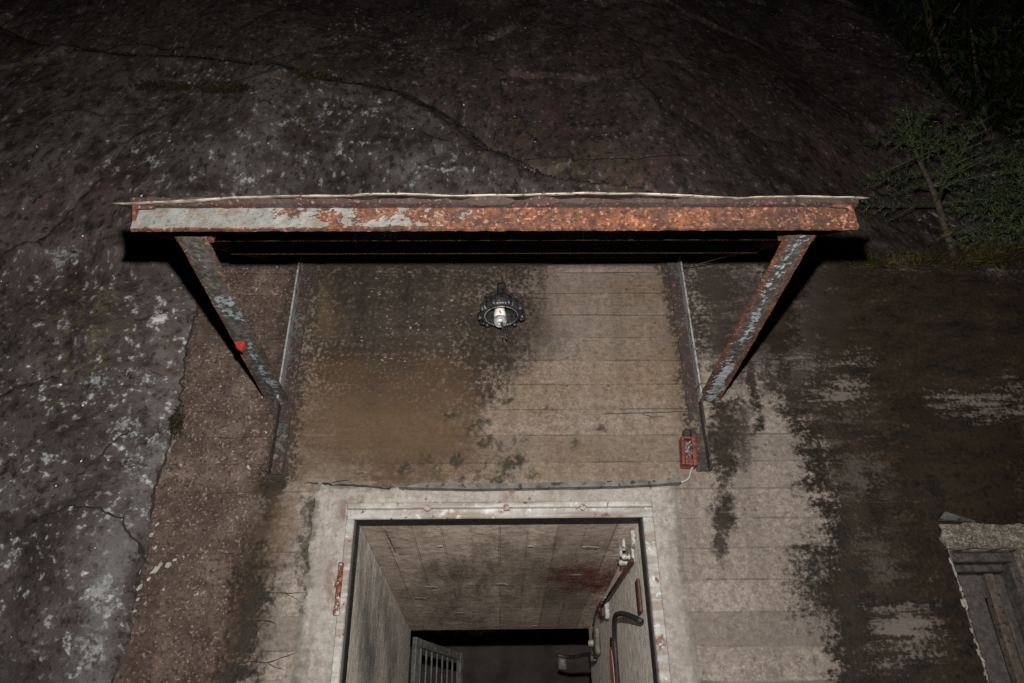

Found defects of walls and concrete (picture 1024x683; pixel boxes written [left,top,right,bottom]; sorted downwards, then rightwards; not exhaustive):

water stain [689,253,773,371]
water stain [311,313,540,486]
water stain [707,239,1024,683]